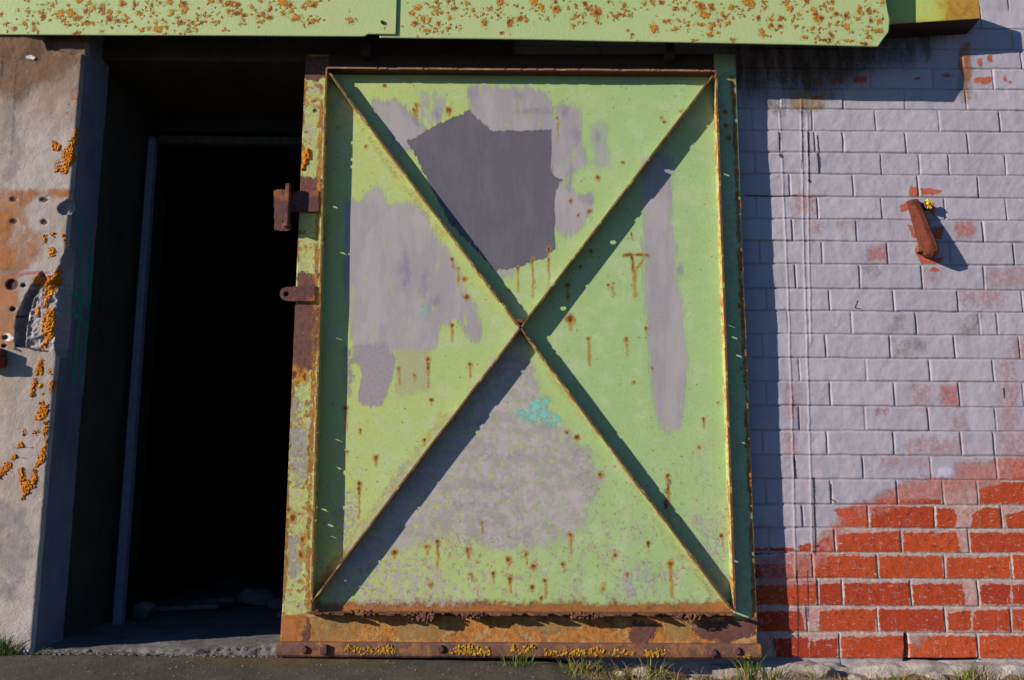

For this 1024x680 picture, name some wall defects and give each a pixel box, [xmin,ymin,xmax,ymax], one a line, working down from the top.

corrosion [400,0,890,46]
corrosion [0,186,74,349]
spalling [1,246,76,358]
corrosion [282,81,732,623]
peeling [754,333,1024,664]